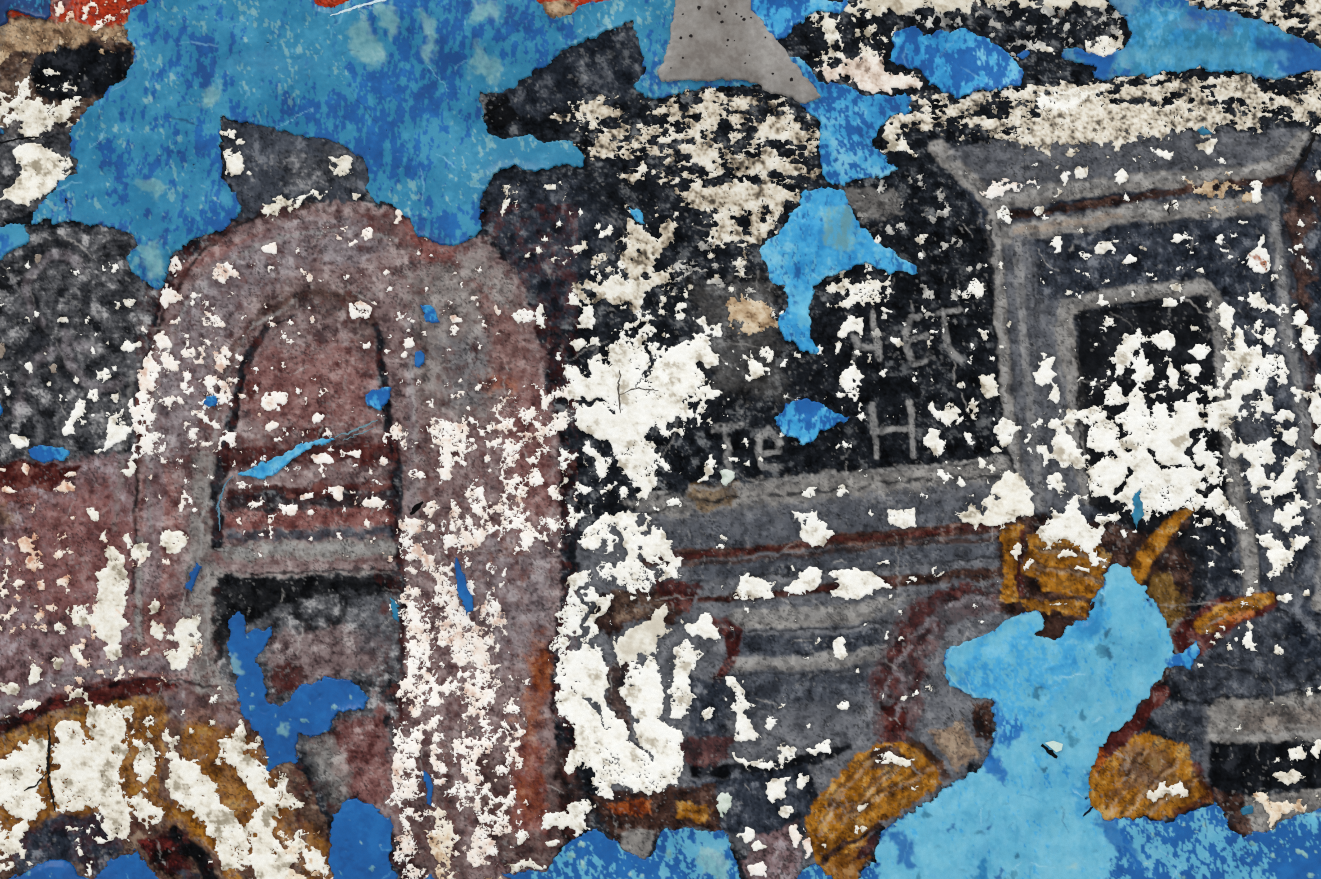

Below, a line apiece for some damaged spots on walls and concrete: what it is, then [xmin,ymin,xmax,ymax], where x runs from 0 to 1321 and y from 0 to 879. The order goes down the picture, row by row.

spalling [803,0,1321,673]
spalling [0,86,835,879]
peeling [721,560,917,615]
peeling [901,646,973,701]
crack [24,724,56,811]
peeling [854,786,923,845]
peeling [874,748,915,767]
peeling [982,698,1000,766]
peeling [1041,741,1063,759]
peeling [1147,781,1188,802]
peeling [1240,737,1321,830]
peeling [858,863,881,879]